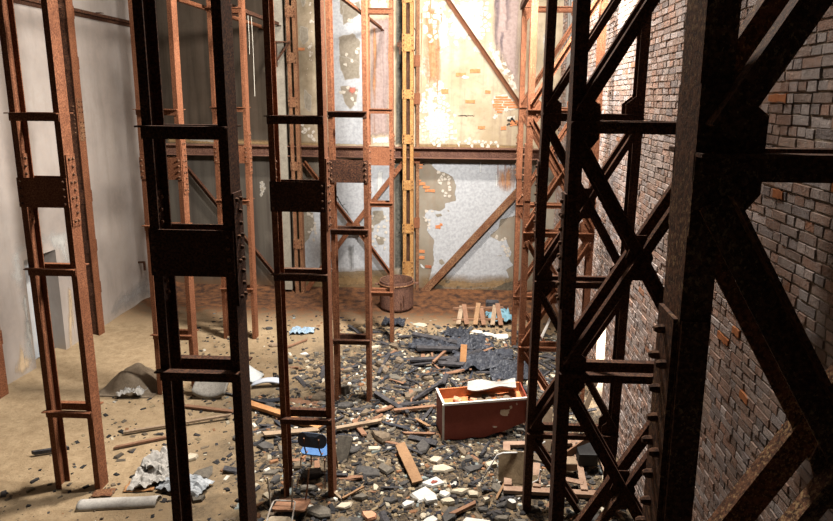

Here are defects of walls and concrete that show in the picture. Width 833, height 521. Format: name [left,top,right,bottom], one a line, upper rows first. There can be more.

peeling [332,0,389,145]
peeling [419,0,519,148]
peeling [419,163,516,289]